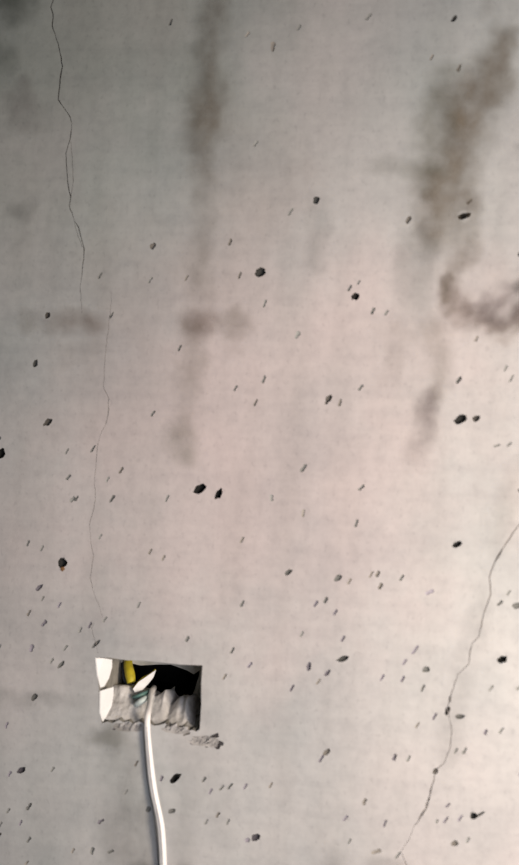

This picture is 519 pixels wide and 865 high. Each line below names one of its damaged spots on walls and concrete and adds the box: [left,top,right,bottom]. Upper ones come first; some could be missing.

crack [50,1,85,304]
crack [401,525,519,865]